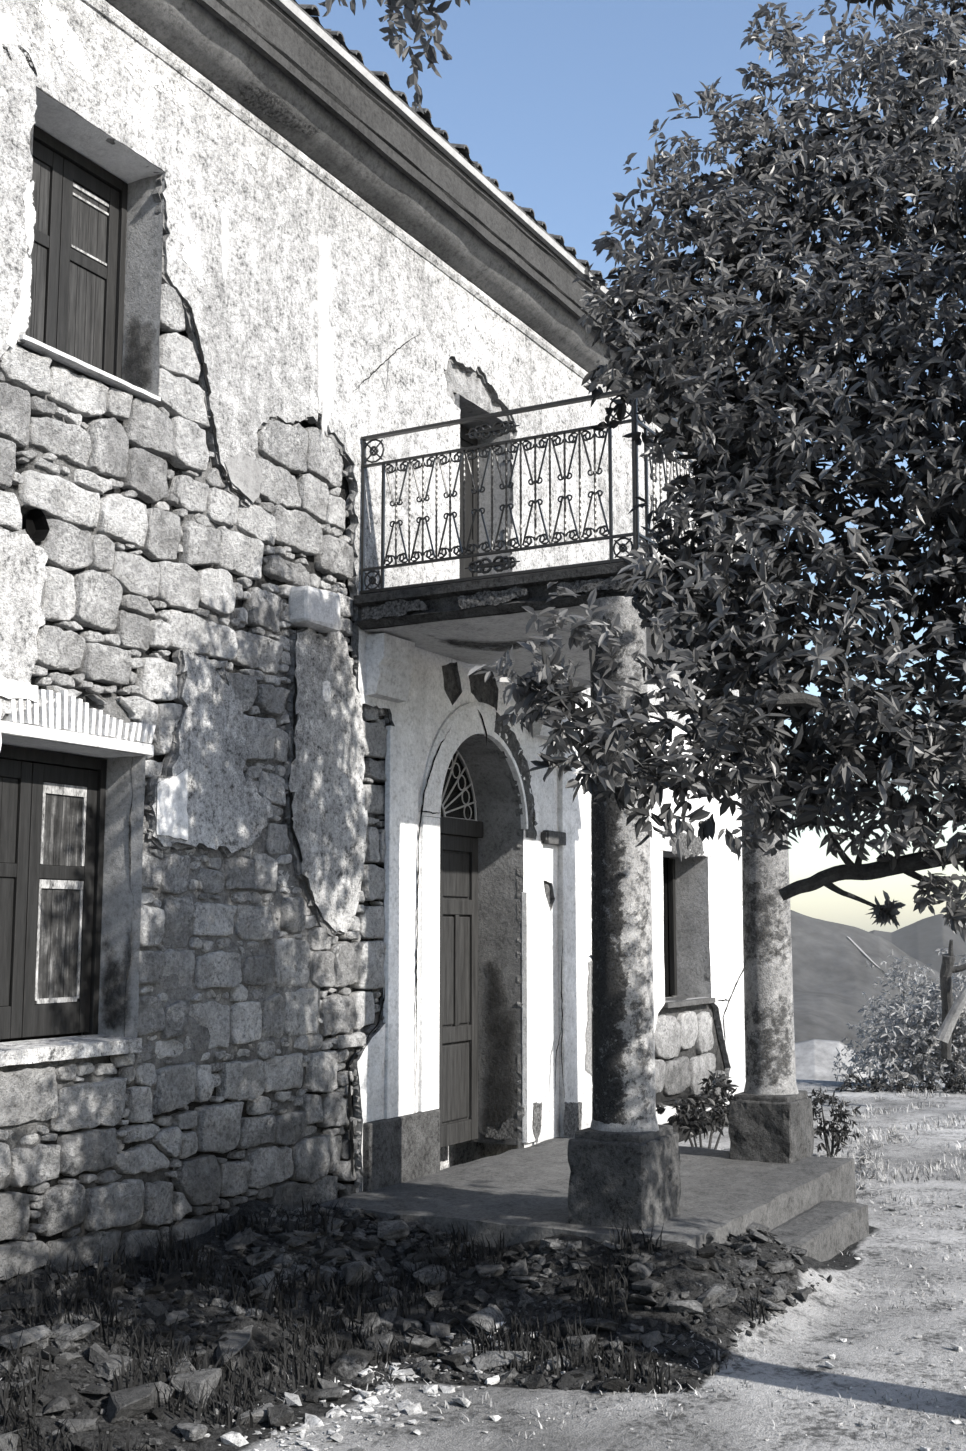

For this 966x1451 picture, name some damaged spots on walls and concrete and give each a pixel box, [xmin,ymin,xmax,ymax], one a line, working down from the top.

leakage [102,938,132,1030]
spalling [0,180,429,1288]
leakage [590,614,653,1125]